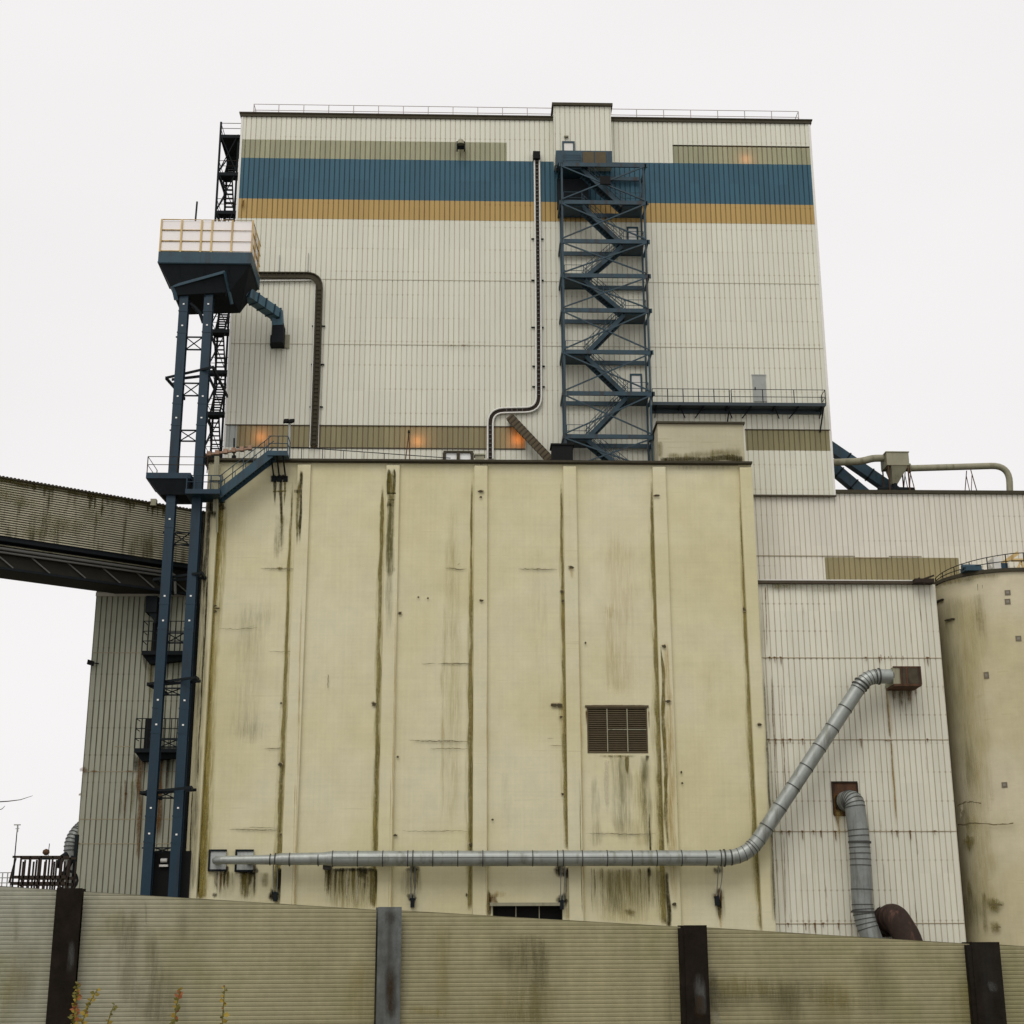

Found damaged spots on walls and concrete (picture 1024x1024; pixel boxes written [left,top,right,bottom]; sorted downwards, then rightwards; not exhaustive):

water stain [190,472,303,899]
water stain [325,866,377,905]
water stain [373,470,396,851]
water stain [560,494,581,850]
water stain [605,755,629,803]
water stain [581,866,671,926]
water stain [642,492,671,850]
rust [885,686,916,813]